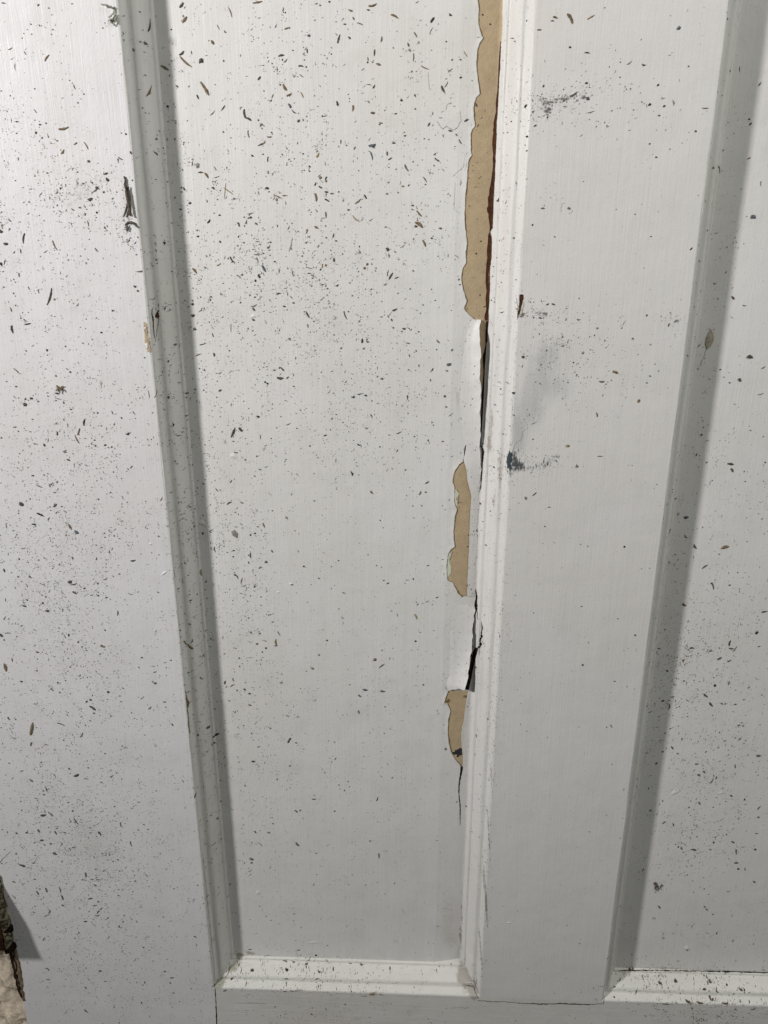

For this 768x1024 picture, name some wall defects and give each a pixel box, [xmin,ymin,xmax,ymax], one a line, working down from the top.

peeling [455,0,507,385]
peeling [440,457,475,769]
crack [456,766,464,815]
crack [460,320,489,690]